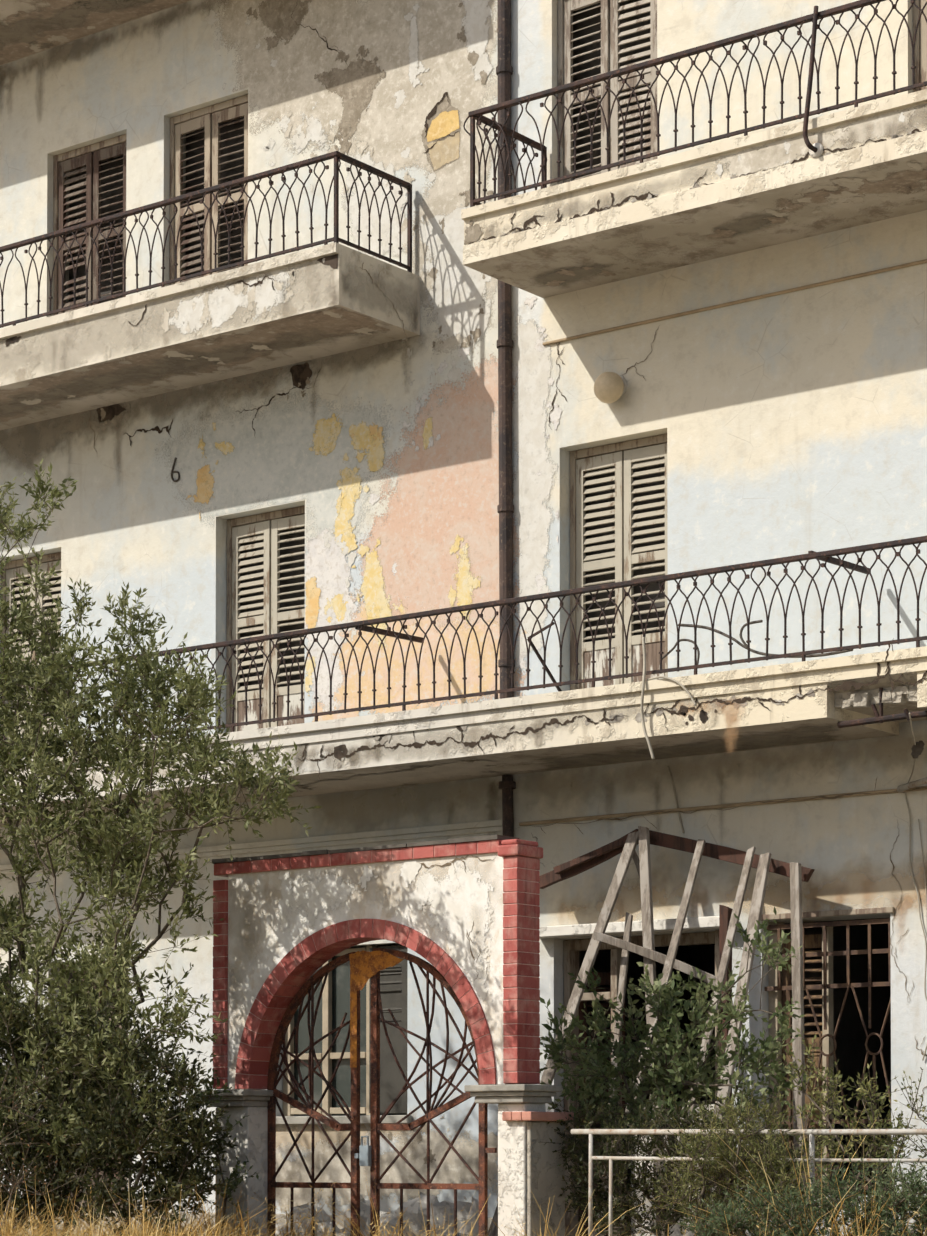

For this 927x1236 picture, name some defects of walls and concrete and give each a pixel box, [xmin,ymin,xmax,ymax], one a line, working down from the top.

peeling [0,0,189,65]
crack [690,128,927,189]
crack [469,192,659,244]
crack [89,412,173,452]
peeling [0,268,390,424]
crack [239,362,322,431]
peeling [155,0,562,722]
crack [549,342,567,430]
crack [620,327,659,378]
crack [294,638,927,781]
peeling [400,860,494,1009]
corrosion [349,950,404,1068]